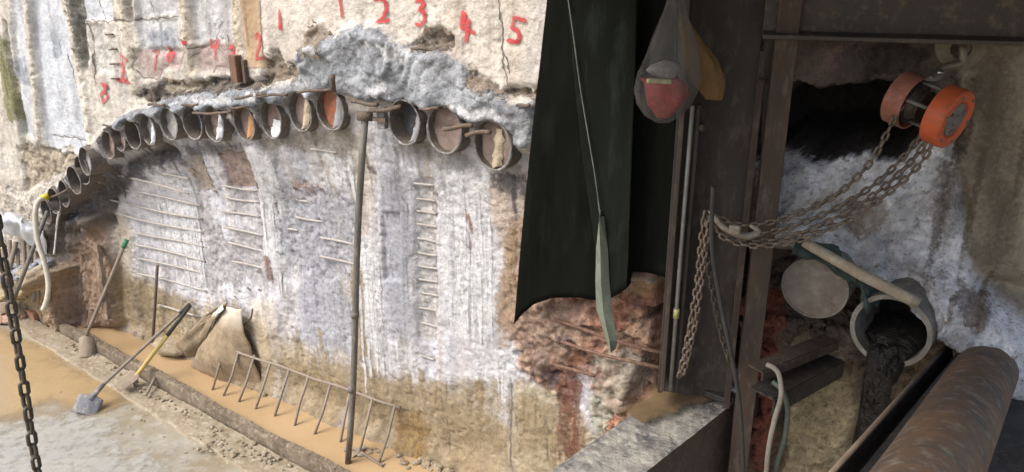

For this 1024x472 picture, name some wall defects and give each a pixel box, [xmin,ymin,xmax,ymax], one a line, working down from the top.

crack [498,0,510,85]
rust [556,350,588,460]